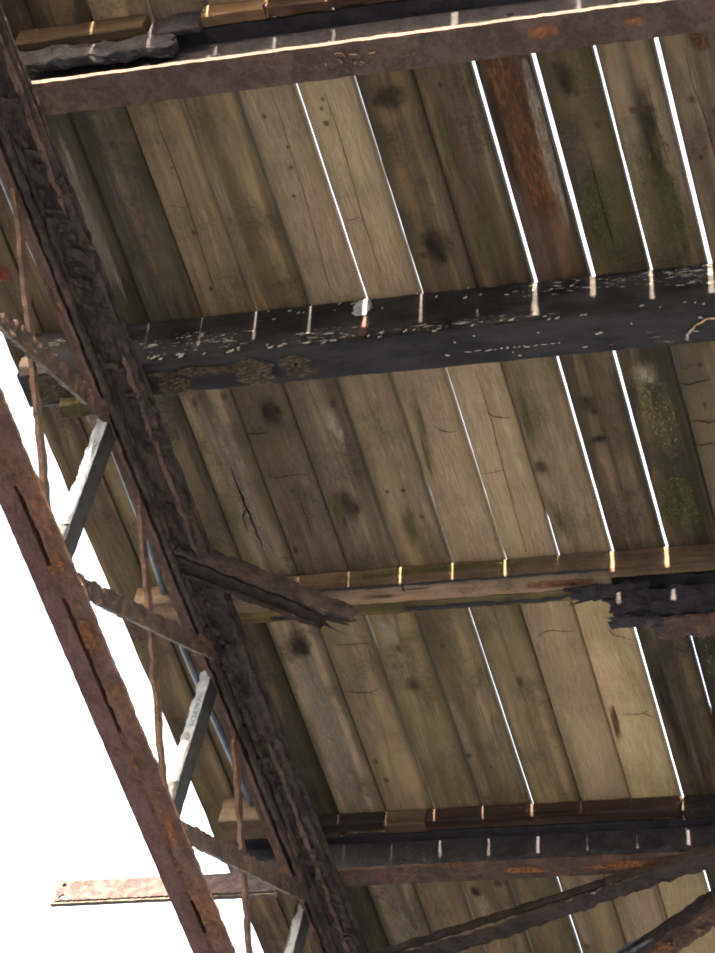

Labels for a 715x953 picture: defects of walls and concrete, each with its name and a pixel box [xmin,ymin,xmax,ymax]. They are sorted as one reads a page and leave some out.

rust [484,56,561,221]
leakage [638,96,663,177]
crack [229,466,262,546]